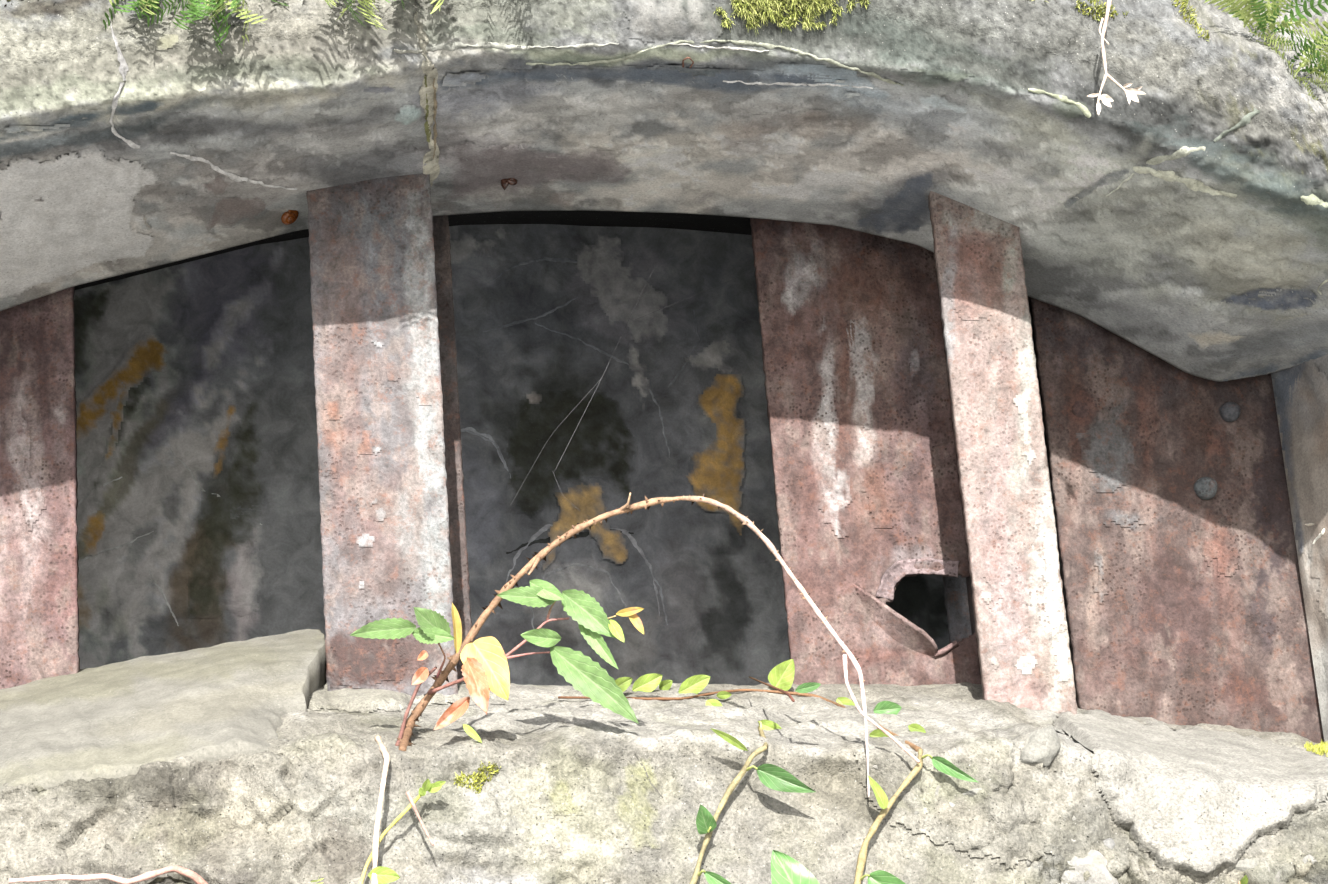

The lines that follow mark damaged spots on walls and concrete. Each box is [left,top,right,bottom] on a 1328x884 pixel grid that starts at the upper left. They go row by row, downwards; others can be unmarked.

crack [109,17,297,190]
crack [393,0,619,187]
corrosion [834,250,864,401]
corrosion [943,234,1005,320]
corrosion [861,461,892,528]
corrosion [1289,364,1328,619]
corrosion [330,629,407,688]